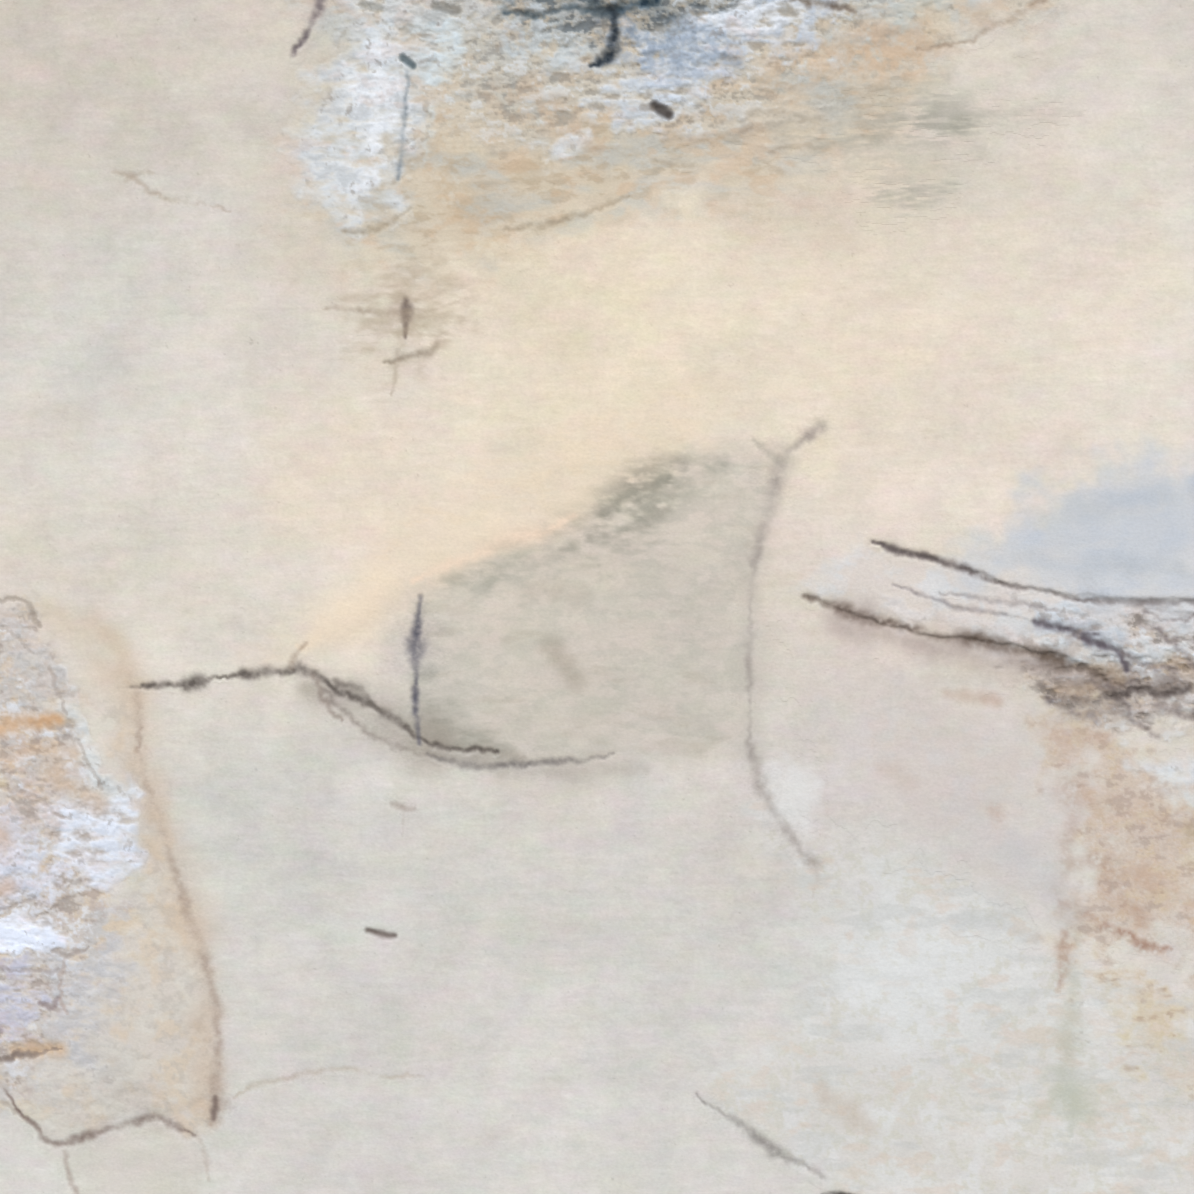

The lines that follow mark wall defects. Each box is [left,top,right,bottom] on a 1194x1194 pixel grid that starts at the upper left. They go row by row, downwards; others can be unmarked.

spalling [254,0,1073,306]
crack [726,410,835,899]
peeling [781,508,1194,627]
crack [799,528,1194,743]
leakage [984,428,1194,547]
peeling [1085,608,1194,703]
peeling [1111,699,1194,746]
peeling [0,578,178,1126]
crack [0,591,618,1194]
rust [1031,677,1194,1126]
crack [691,1090,891,1194]